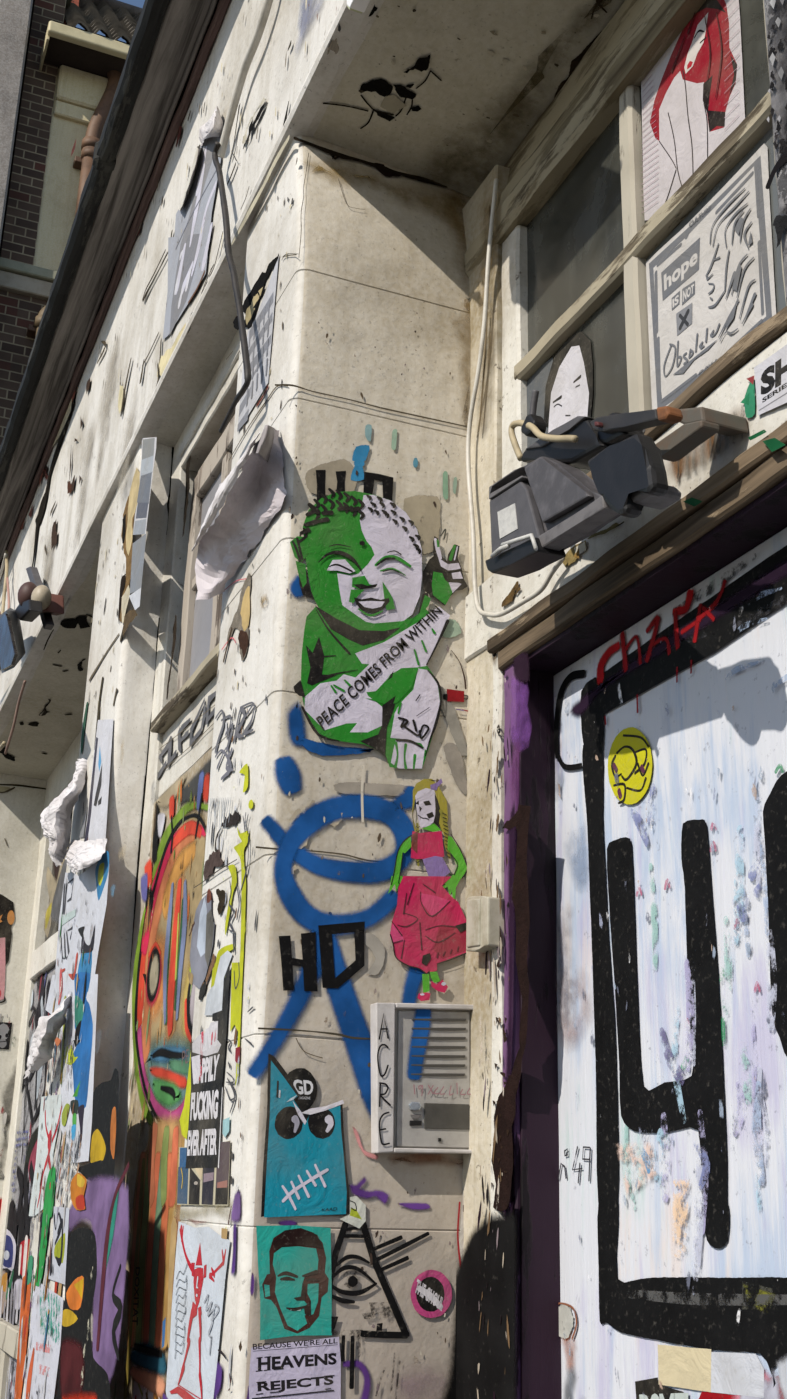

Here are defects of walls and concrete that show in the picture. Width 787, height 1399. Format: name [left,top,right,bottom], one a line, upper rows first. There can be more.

peeling [323,55,442,129]